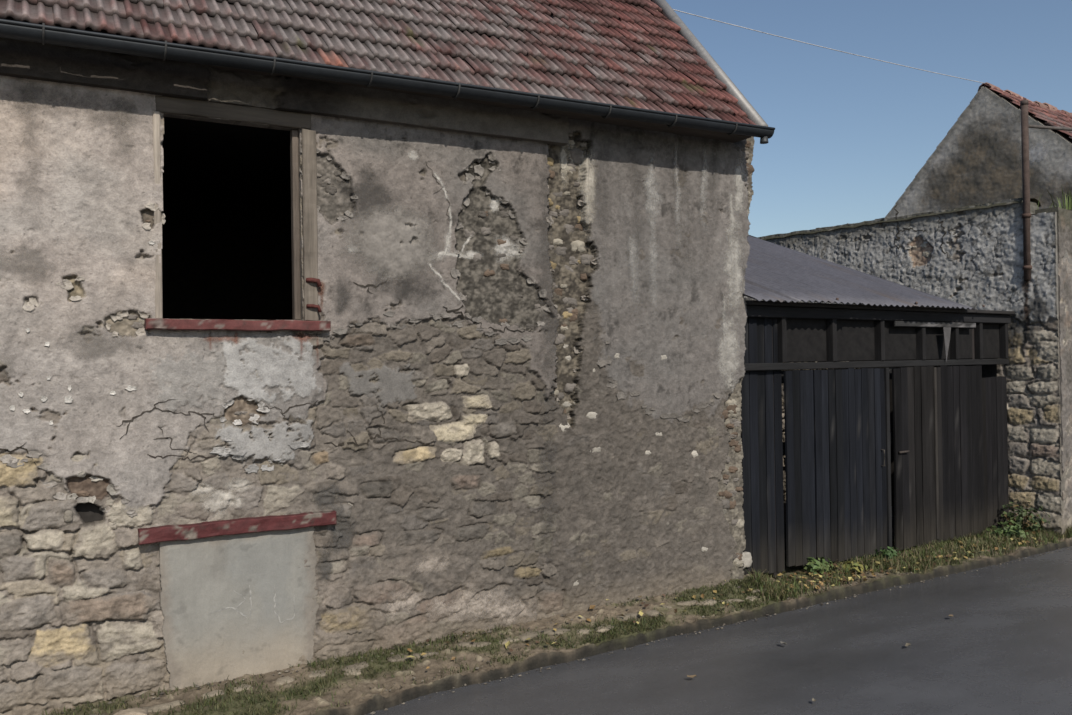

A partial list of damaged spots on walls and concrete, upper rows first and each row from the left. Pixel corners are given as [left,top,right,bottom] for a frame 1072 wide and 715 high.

spalling [141,203,166,245]
crack [425,161,532,333]
spalling [904,236,933,268]
spalling [55,276,84,301]
spalling [316,132,598,428]
spalling [104,311,150,337]
crack [118,399,223,460]
spalling [220,396,270,426]
peeling [210,438,282,474]
spalling [0,451,137,517]